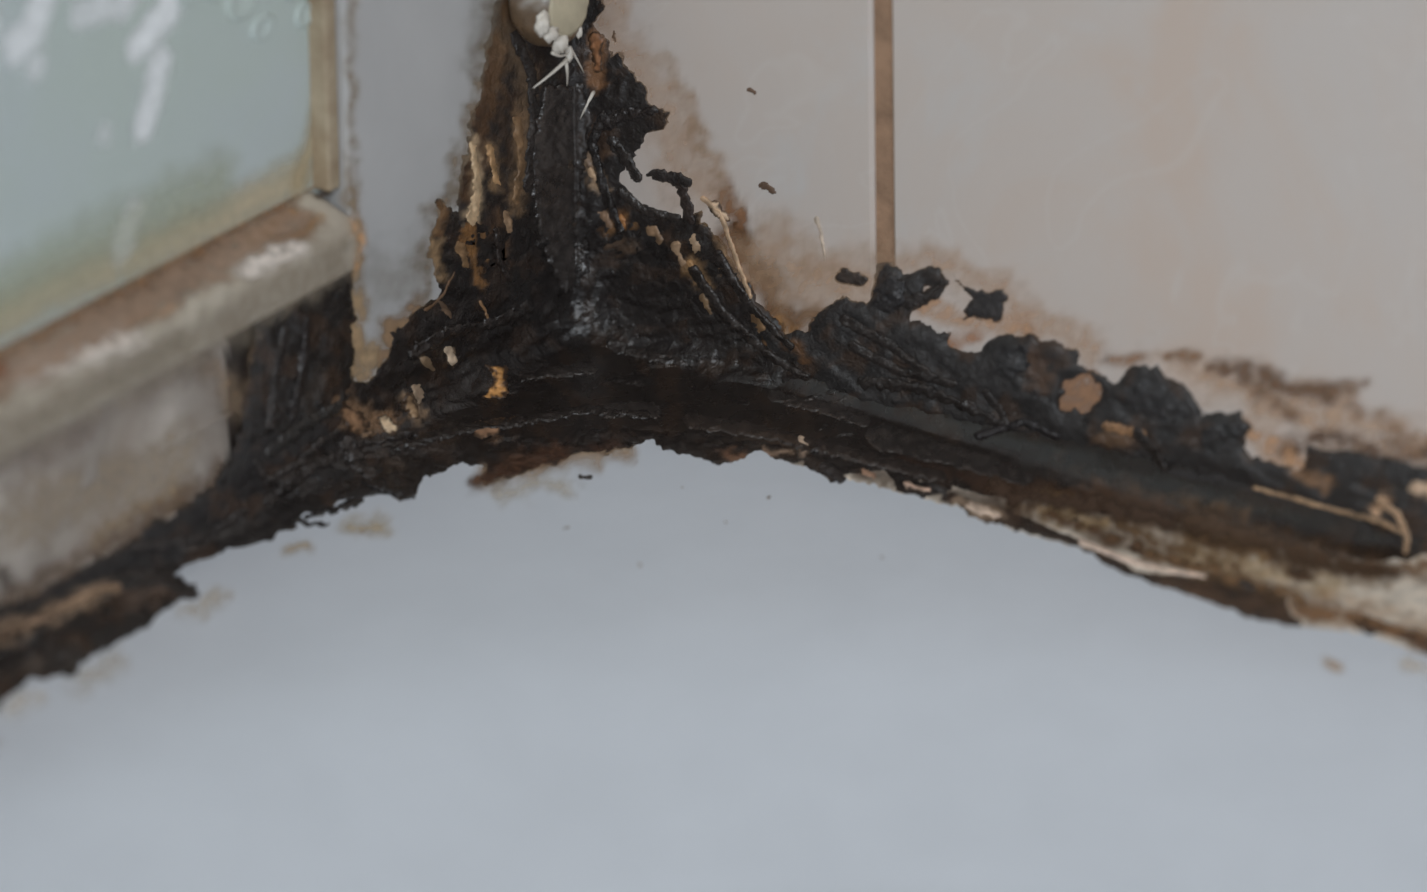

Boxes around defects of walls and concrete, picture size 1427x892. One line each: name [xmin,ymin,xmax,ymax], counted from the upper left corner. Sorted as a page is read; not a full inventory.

damp [0,0,1427,704]